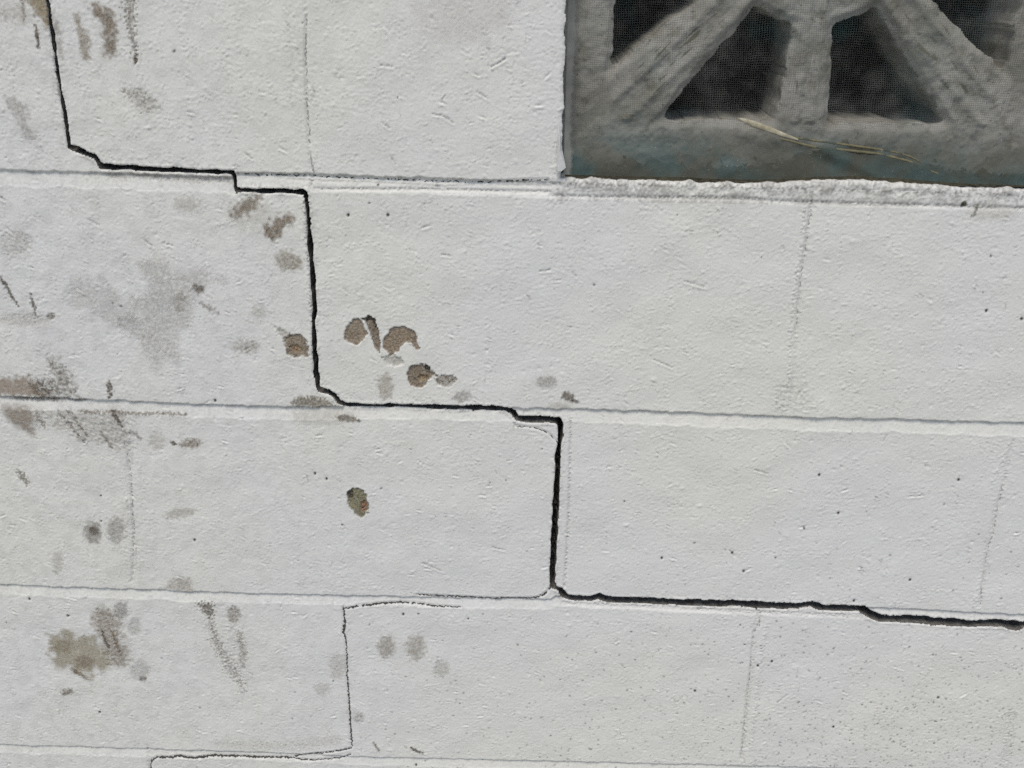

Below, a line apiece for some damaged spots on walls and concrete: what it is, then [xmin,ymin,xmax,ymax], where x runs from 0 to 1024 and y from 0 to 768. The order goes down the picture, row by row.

crack [46,0,1024,631]
peeling [285,334,309,357]
peeling [344,315,420,355]
peeling [407,363,457,387]
peeling [347,488,369,517]